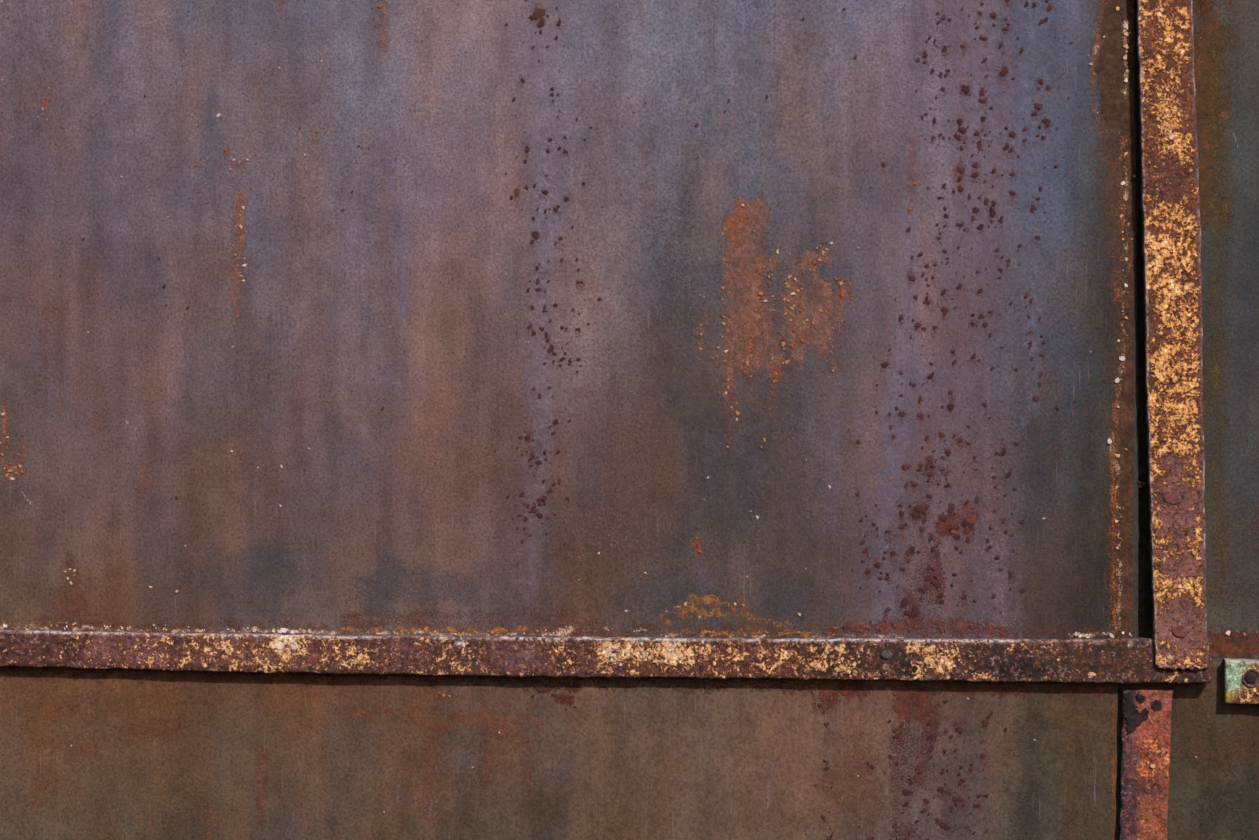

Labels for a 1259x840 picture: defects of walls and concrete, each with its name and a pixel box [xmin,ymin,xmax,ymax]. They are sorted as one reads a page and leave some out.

rust [1156,0,1240,235]
rust [227,192,248,338]
rust [1089,89,1135,469]
rust [0,399,28,484]
rust [0,425,1120,840]